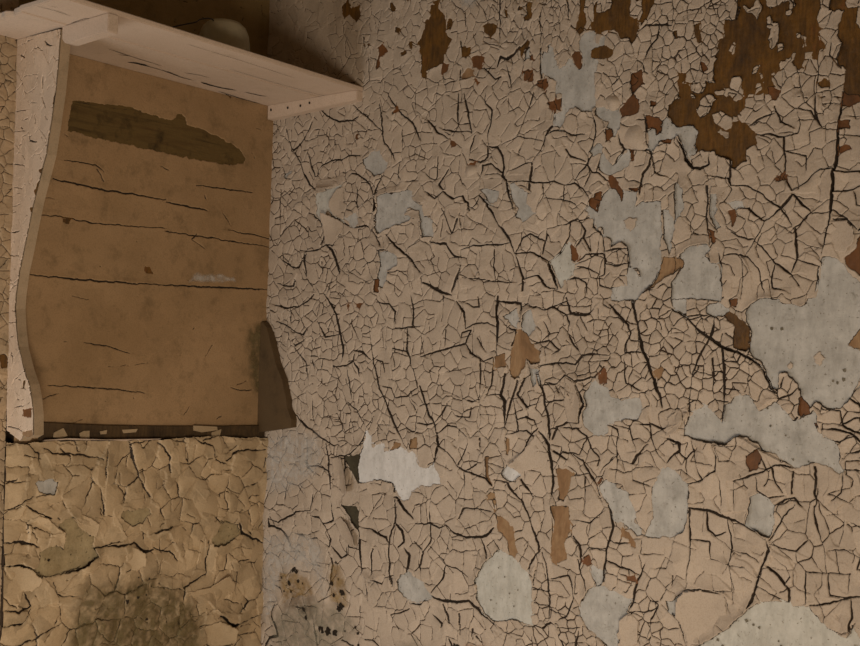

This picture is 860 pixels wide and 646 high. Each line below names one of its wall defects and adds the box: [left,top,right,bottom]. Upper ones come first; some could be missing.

peeling [401,0,454,79]
crack [482,0,524,84]
peeling [519,0,860,169]
crack [679,46,860,290]
crack [30,84,860,611]
flaking render [585,149,860,474]
flaking render [331,430,442,500]
crack [199,585,282,646]
water stain [330,561,345,612]
water stain [318,626,359,646]
crack [512,484,684,646]
flaking render [667,590,860,646]